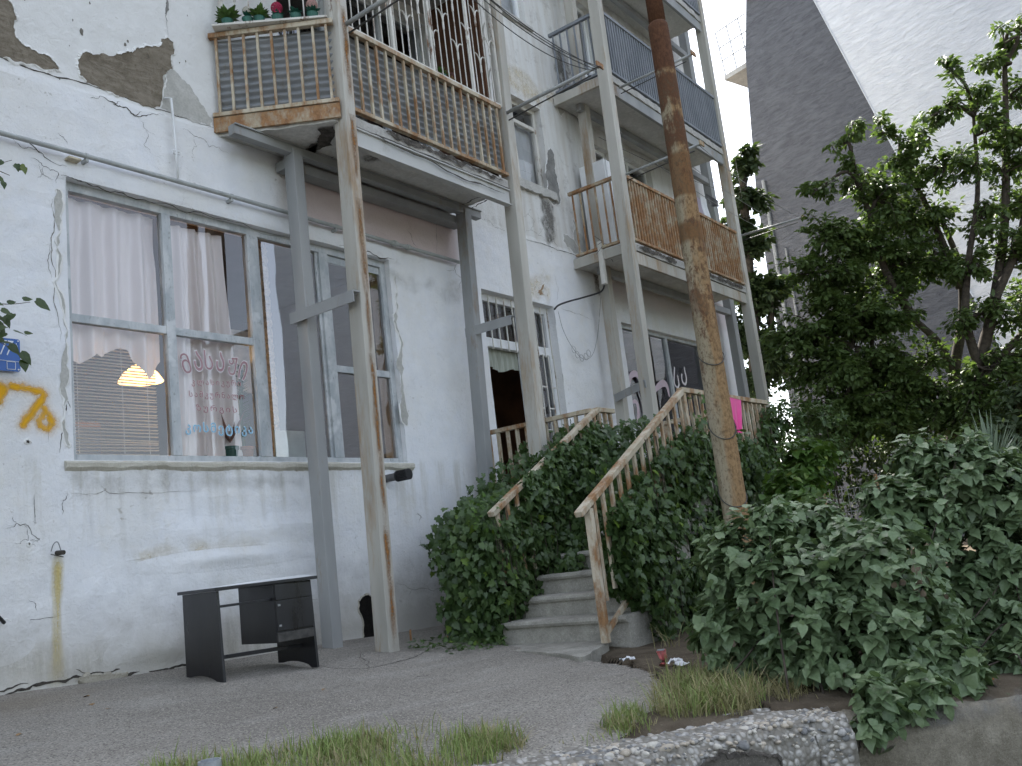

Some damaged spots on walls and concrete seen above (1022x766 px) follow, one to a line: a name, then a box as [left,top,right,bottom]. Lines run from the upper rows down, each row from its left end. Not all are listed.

peeling [0,0,62,80]
crack [0,57,228,154]
peeling [69,35,212,127]
crack [13,139,285,236]
spalling [306,127,335,153]
peeling [545,148,561,206]
crack [47,204,61,340]
corrosion [370,359,381,454]
corrosion [384,534,395,626]
crack [0,664,186,695]